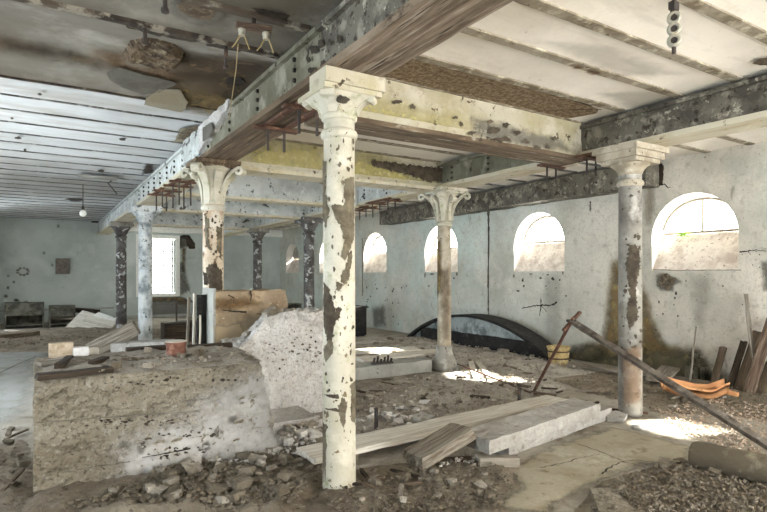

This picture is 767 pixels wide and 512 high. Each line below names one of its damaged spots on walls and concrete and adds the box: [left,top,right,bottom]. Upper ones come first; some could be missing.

peeling [107,26,241,112]
flaking render [383,59,602,119]
spalling [174,126,198,142]
peeling [371,159,443,183]
peeling [452,116,568,151]
peeling [203,213,223,290]
peeling [265,138,356,482]
water stain [569,261,618,366]
peeling [621,234,643,350]
spalling [657,273,686,305]
water stain [642,292,729,384]
crack [540,444,648,474]